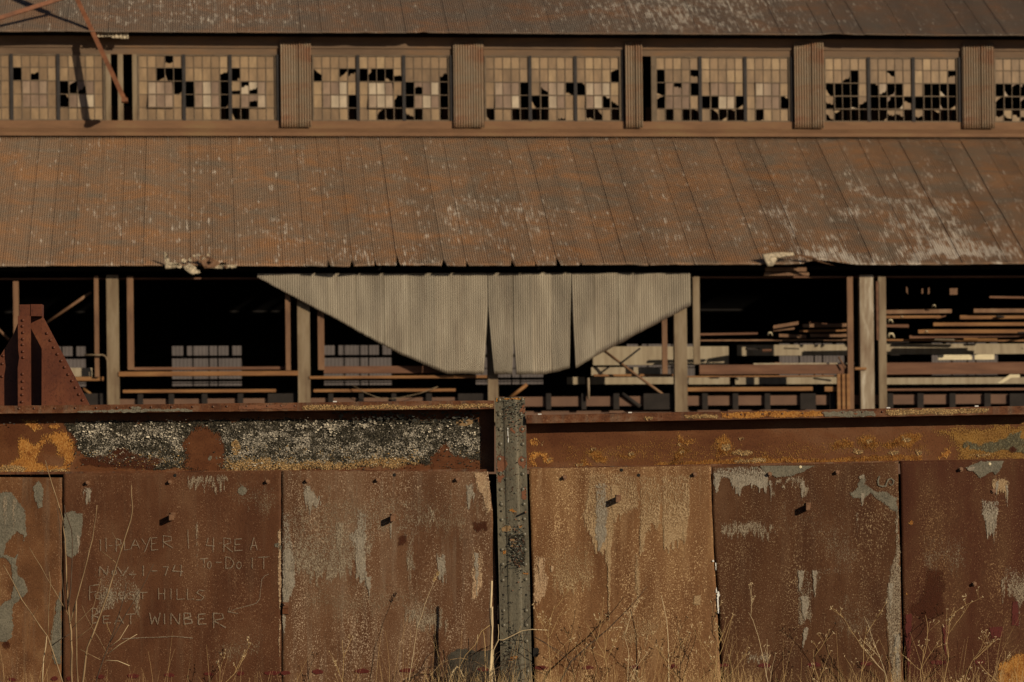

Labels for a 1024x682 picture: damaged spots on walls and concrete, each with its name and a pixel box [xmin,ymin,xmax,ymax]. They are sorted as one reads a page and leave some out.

rust [0,420,76,477]
peeling [65,406,483,471]
rust [181,424,419,471]
rust [527,408,1024,467]